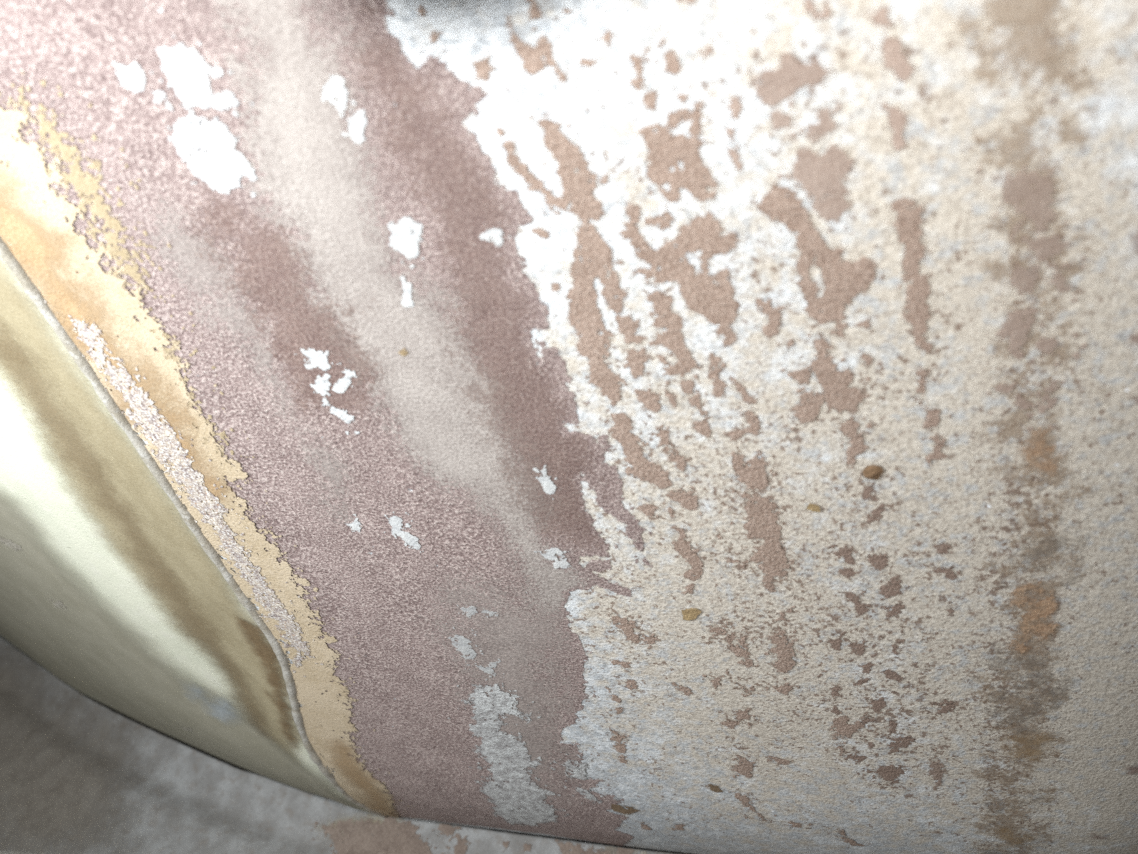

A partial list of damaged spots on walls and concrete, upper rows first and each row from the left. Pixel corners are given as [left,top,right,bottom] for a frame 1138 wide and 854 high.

corrosion [971,0,1096,93]
peeling [112,34,257,197]
peeling [321,75,367,144]
peeling [387,217,424,310]
peeling [479,222,504,247]
peeling [294,348,360,435]
peeling [345,514,362,532]
peeling [384,511,424,553]
peeling [533,465,561,499]
peeling [534,547,571,569]
corrosion [973,96,1090,854]
peeling [445,605,618,826]